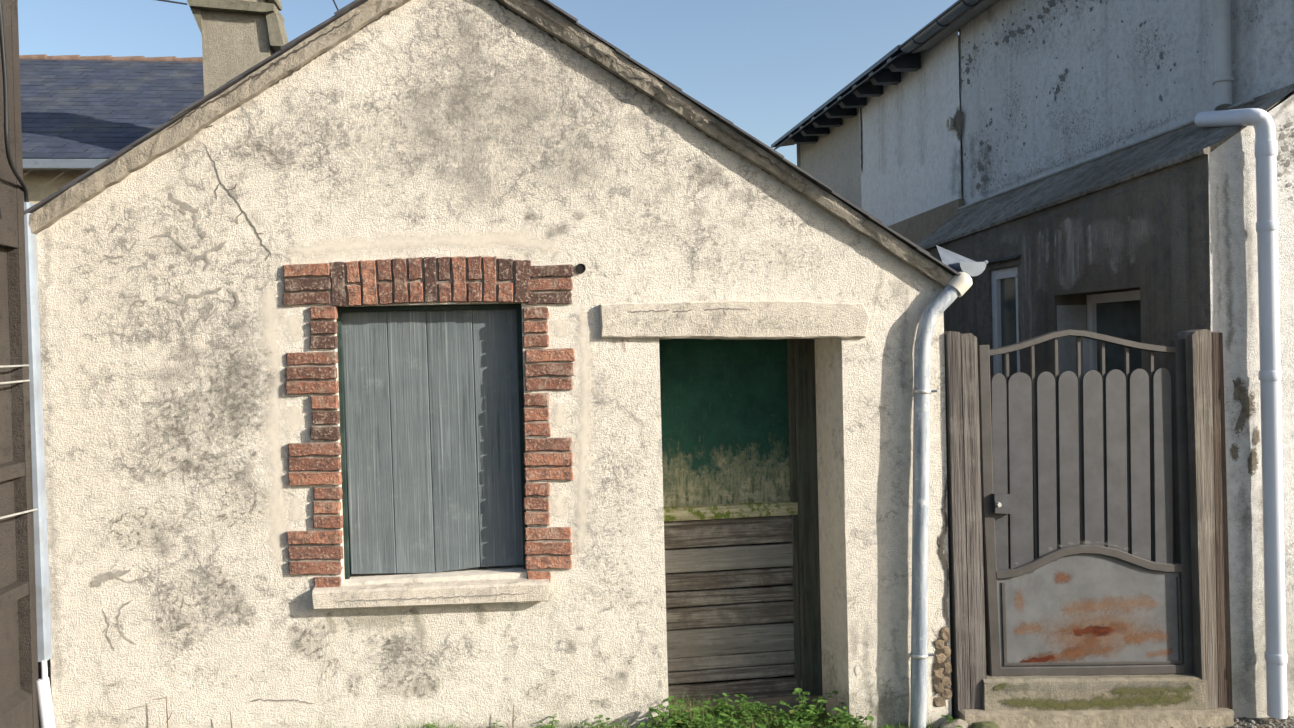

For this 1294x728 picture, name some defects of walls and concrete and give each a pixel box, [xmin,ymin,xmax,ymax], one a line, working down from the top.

crack [163,4,404,261]
spalling [1230,377,1260,475]
crack [102,572,255,650]
corrosion [1020,623,1127,663]